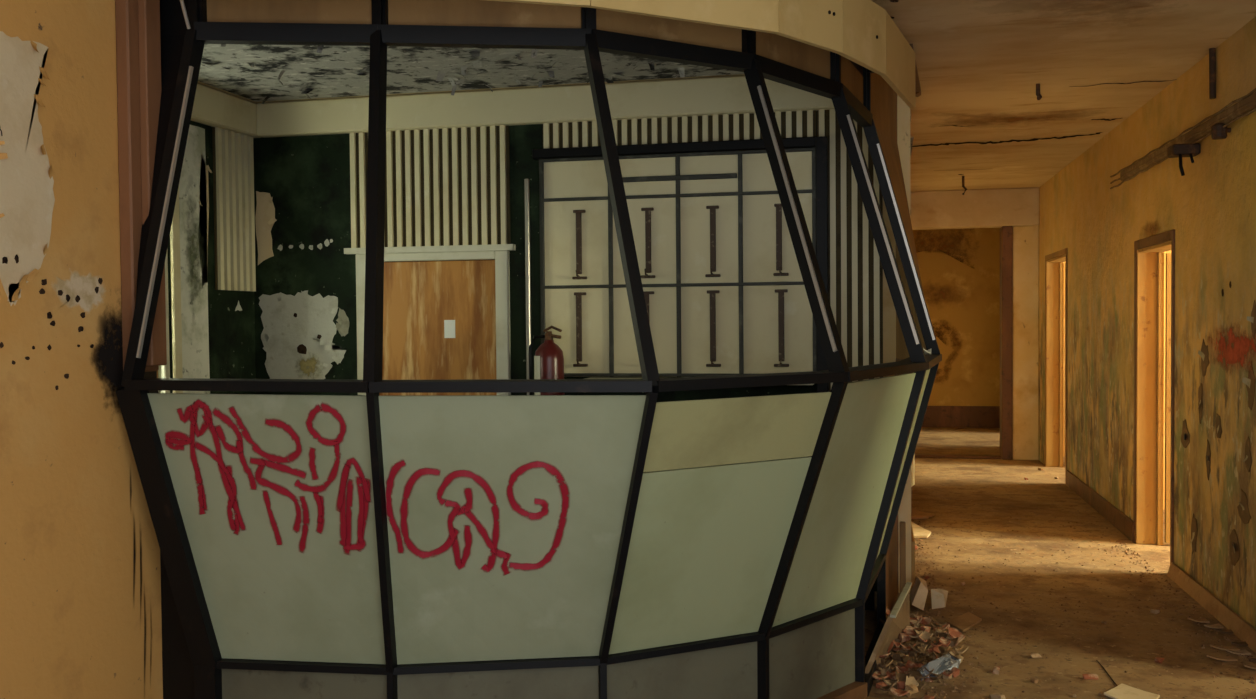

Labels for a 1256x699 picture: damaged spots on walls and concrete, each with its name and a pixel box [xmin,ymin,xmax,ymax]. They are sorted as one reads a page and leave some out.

peeling [0,31,111,332]
peeling [259,290,349,379]
water stain [932,322,961,382]